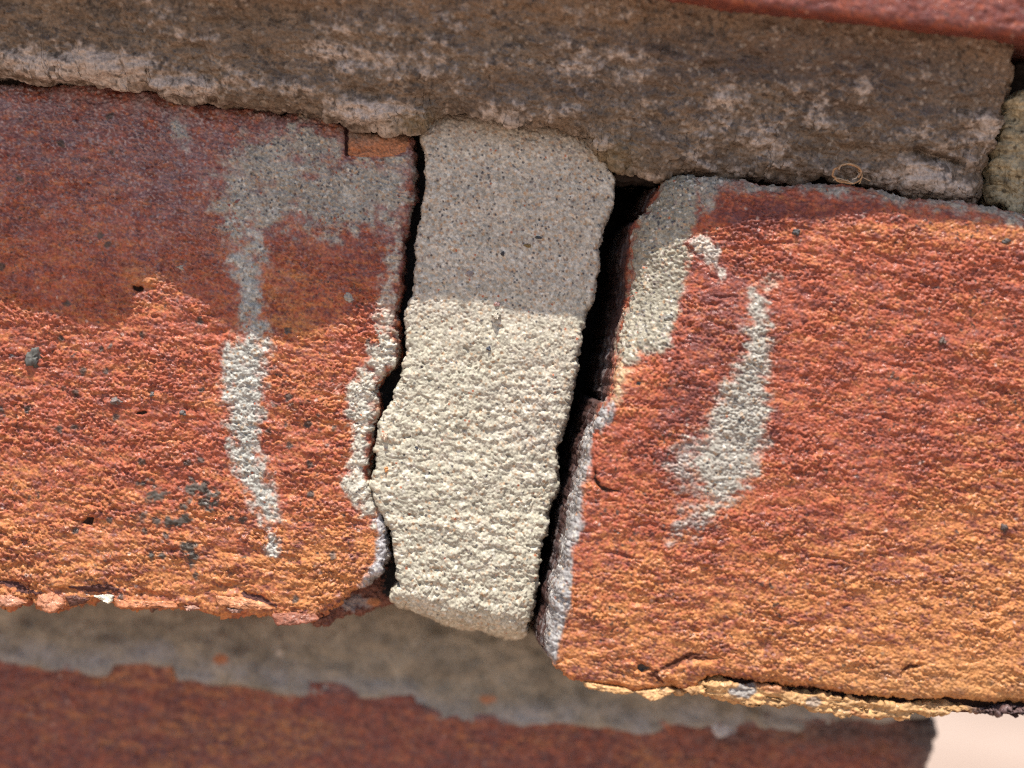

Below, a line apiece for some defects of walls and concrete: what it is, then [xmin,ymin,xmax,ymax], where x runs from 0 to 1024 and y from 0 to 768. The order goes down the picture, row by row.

crack [0,79,49,87]
crack [748,179,835,187]
crack [373,135,426,470]
crack [556,173,661,470]
crack [594,470,619,492]
crack [380,529,398,596]
spalling [582,674,1024,721]